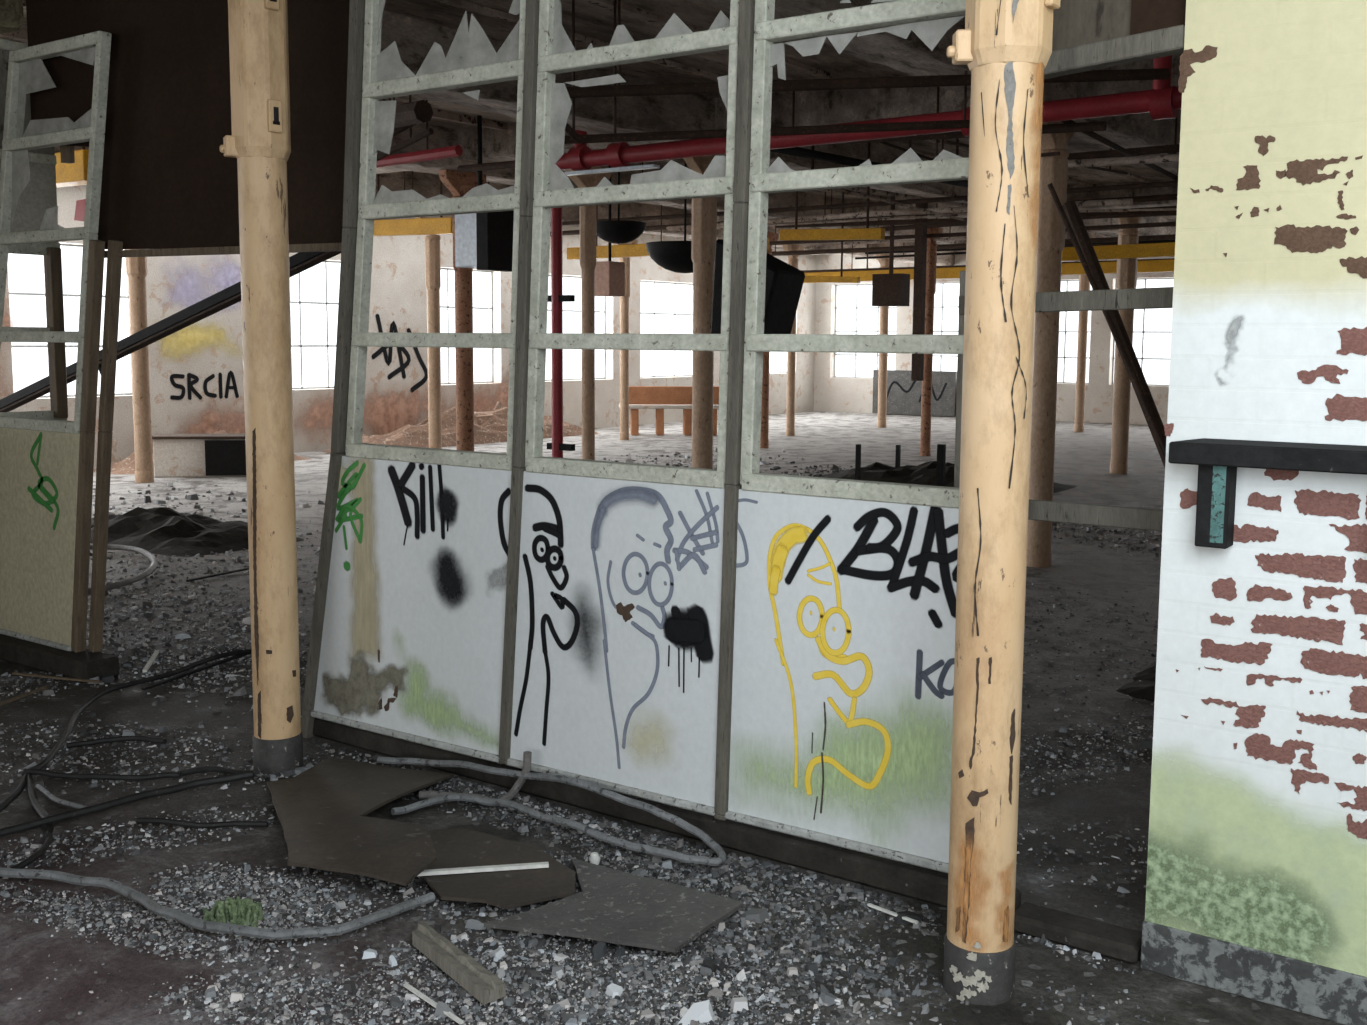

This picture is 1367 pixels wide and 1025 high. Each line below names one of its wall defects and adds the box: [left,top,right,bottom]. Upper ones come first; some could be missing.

peeling [1004,61,1016,215]
spalling [1178,45,1218,93]
peeling [1191,135,1367,278]
peeling [1297,327,1367,422]
peeling [1180,488,1197,509]
peeling [1198,469,1367,839]
peeling [949,770,992,1001]